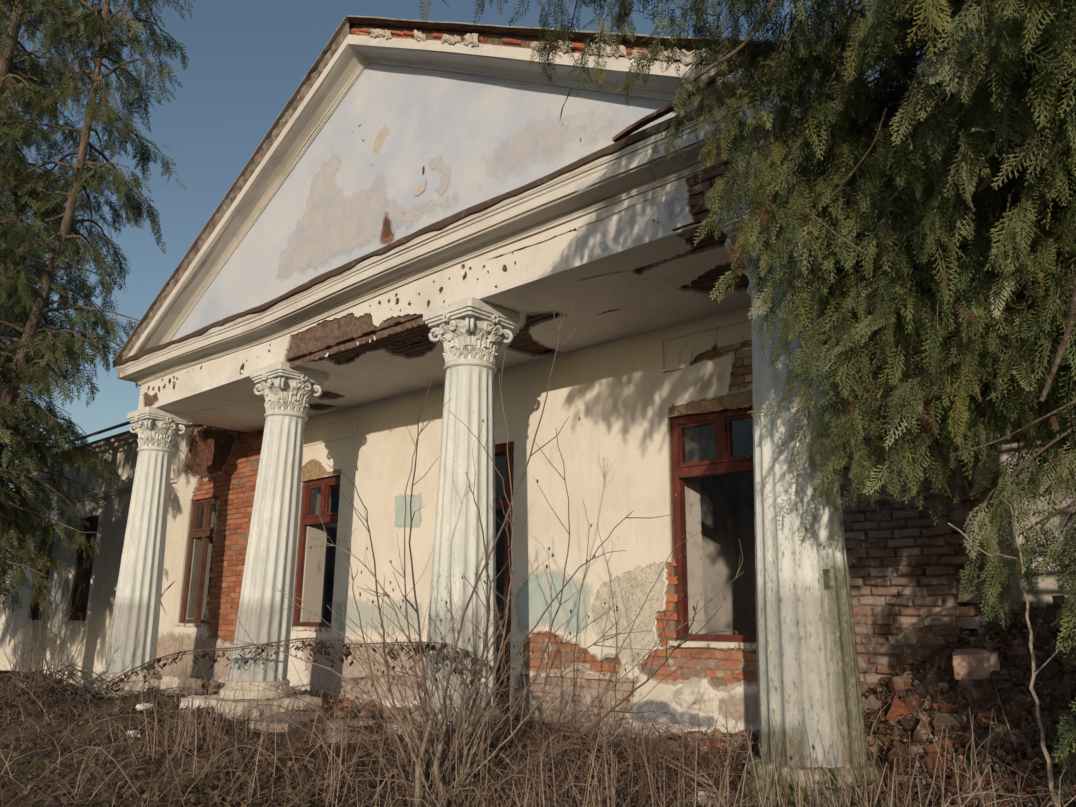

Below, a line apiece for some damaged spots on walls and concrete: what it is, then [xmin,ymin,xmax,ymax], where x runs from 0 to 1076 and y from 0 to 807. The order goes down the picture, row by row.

flaking render [349,25,797,71]
peeling [279,157,450,277]
flaking render [283,252,516,367]
flaking render [505,312,569,358]
crack [487,195,662,260]
flaking render [631,157,738,276]
flaking render [668,339,753,416]
flaking render [674,260,749,294]
flaking render [301,458,342,482]
flaking render [819,277,971,692]
flaking render [155,424,264,681]
peeling [511,559,759,739]